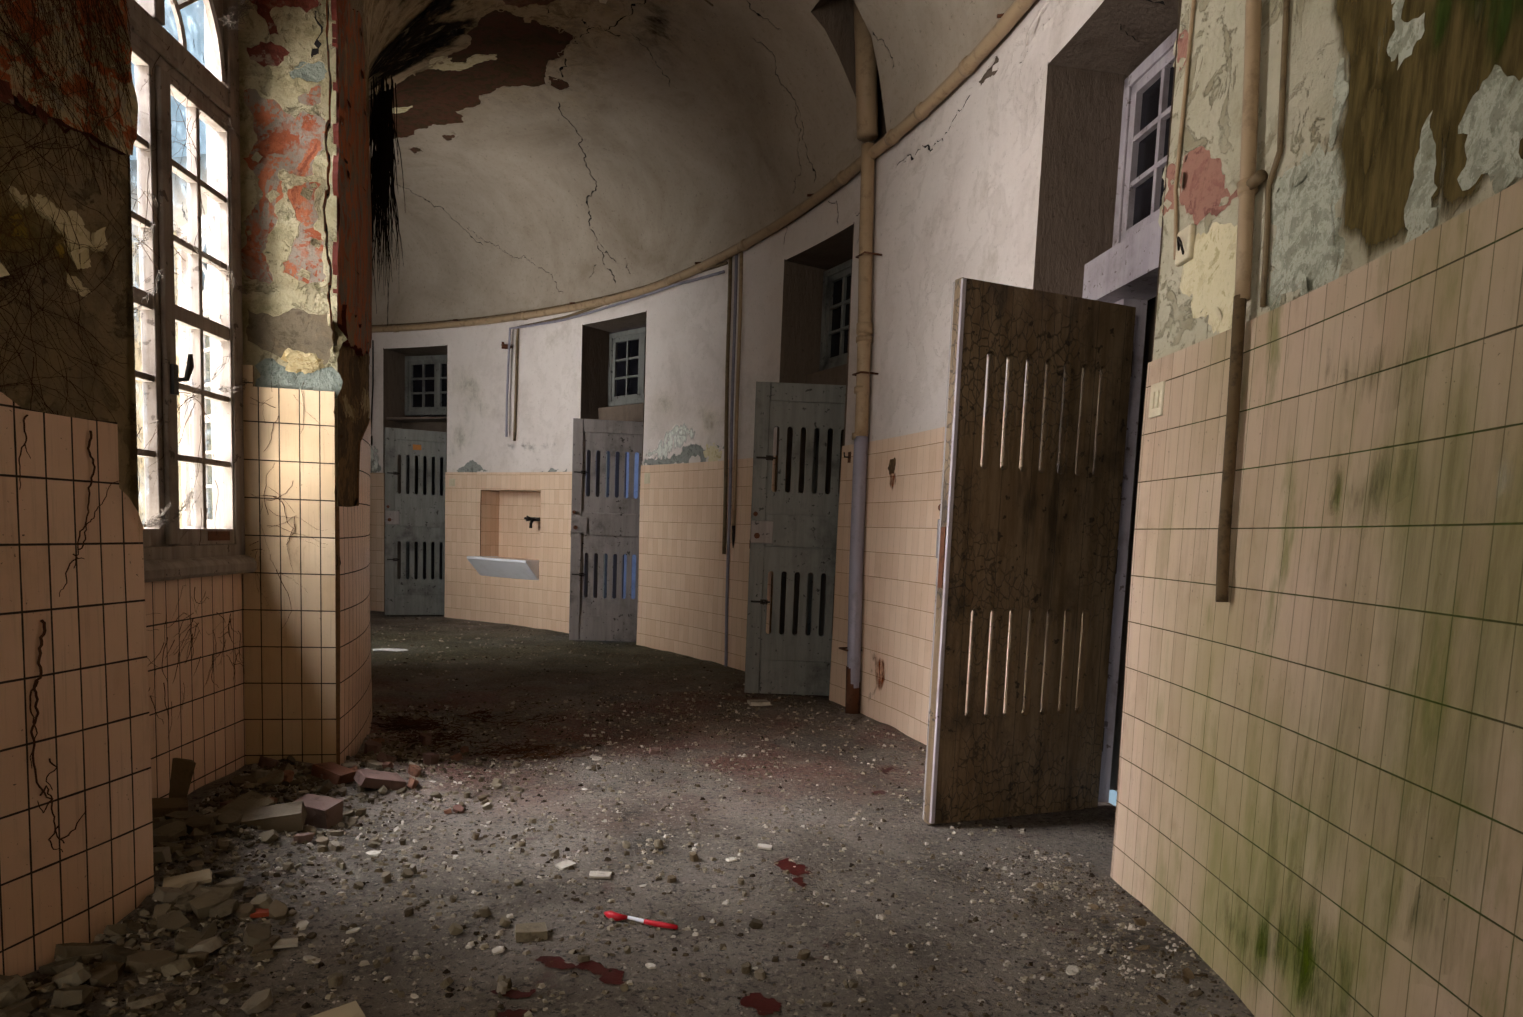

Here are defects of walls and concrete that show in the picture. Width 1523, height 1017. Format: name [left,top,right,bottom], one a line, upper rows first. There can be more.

peeling [0,0,138,155]
peeling [70,227,108,269]
peeling [242,0,580,507]
damp [369,0,475,99]
crack [390,0,647,293]
damp [1152,0,1523,361]